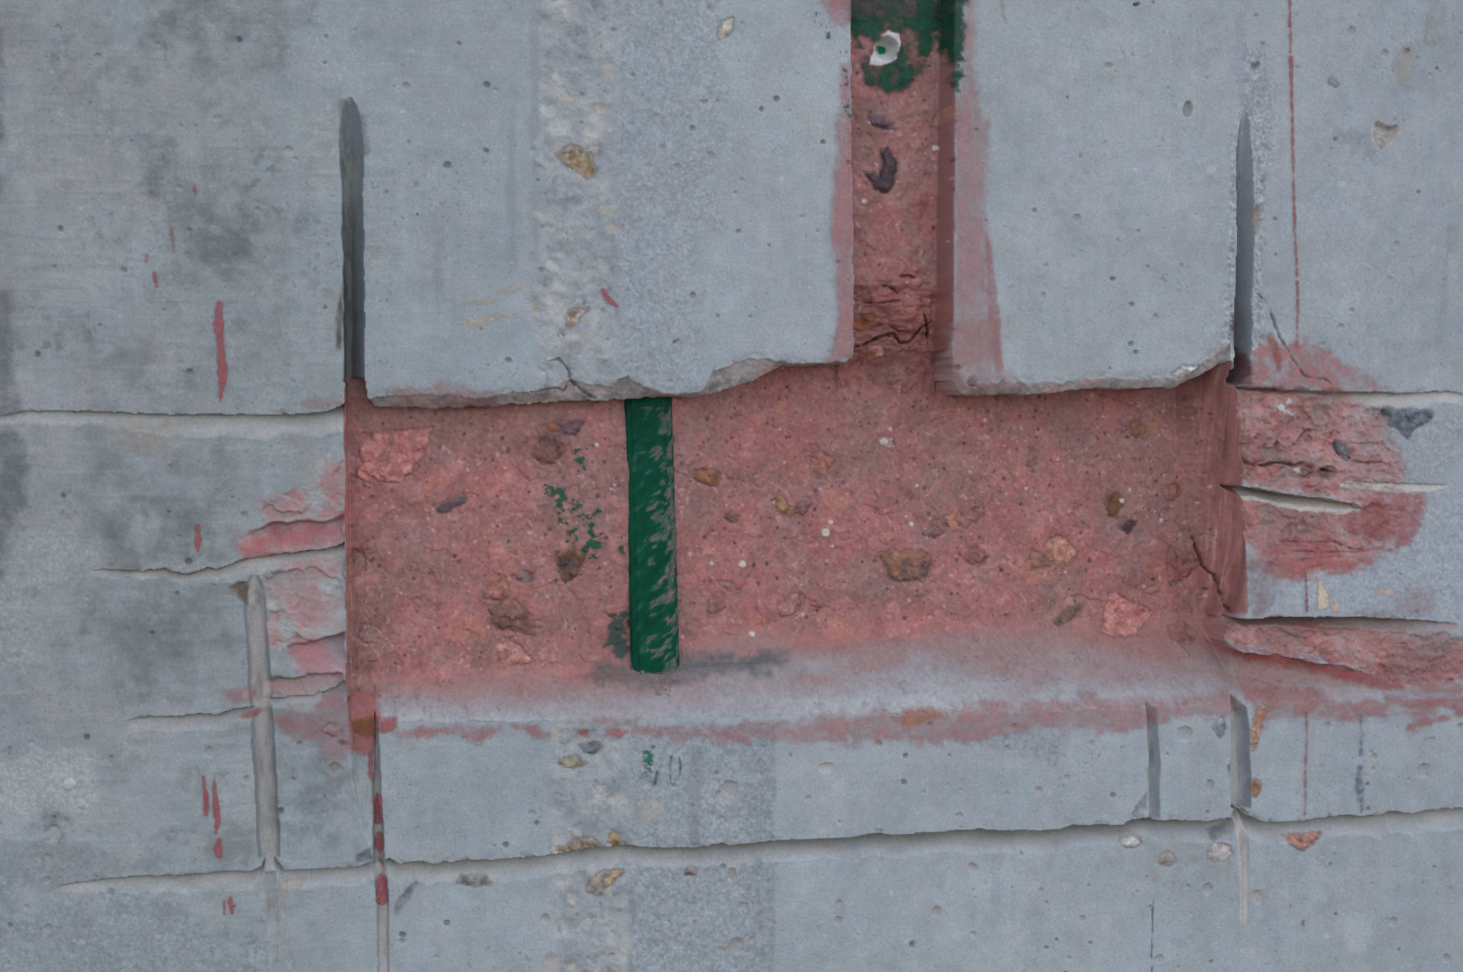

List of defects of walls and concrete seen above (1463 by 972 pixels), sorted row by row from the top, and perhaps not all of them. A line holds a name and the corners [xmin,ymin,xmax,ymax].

spalling [368,0,885,409]
flaking render [865,150,899,194]
spalling [335,284,345,353]
spalling [939,338,1231,397]
crack [1240,427,1397,474]
spalling [1235,384,1434,583]
spalling [229,428,434,697]
flaking render [555,546,587,585]
flaking render [880,498,987,583]
crack [1279,539,1370,556]
flaking render [488,600,536,665]
spalling [1169,622,1463,690]